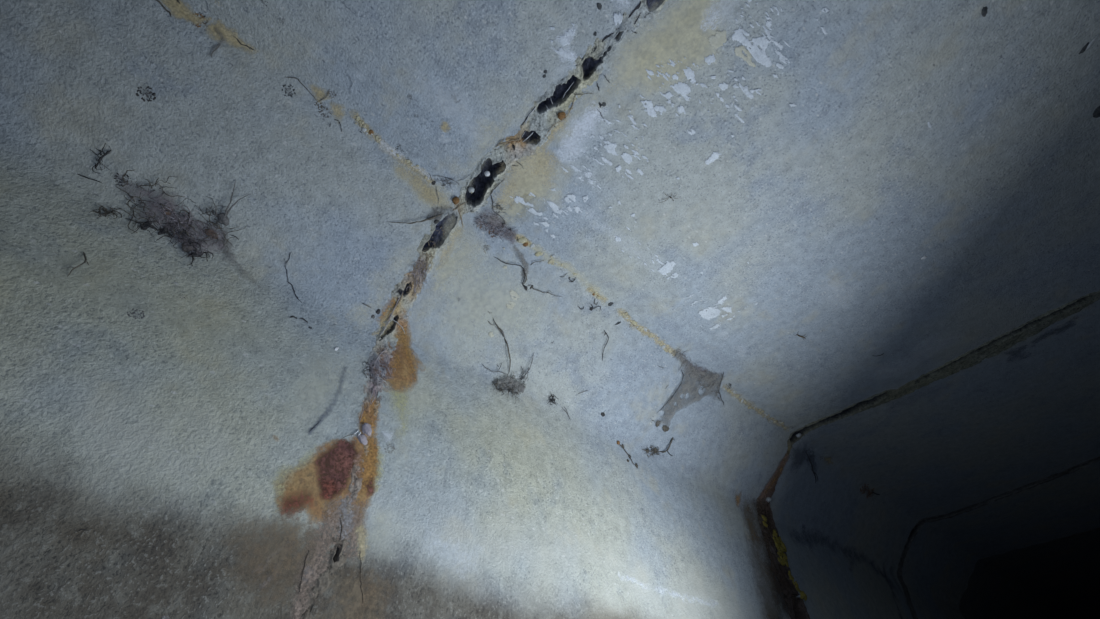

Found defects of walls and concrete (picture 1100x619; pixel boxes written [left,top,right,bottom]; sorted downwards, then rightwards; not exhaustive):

water stain [623,0,715,84]
peeling [510,0,790,238]
spalling [465,158,506,207]
water stain [497,122,564,216]
spalling [422,212,458,252]
peeling [615,213,678,279]
crack [285,254,312,329]
corrosion [374,299,420,391]
corrosion [277,400,382,528]
crack [340,519,363,599]
corrosion [755,453,796,615]